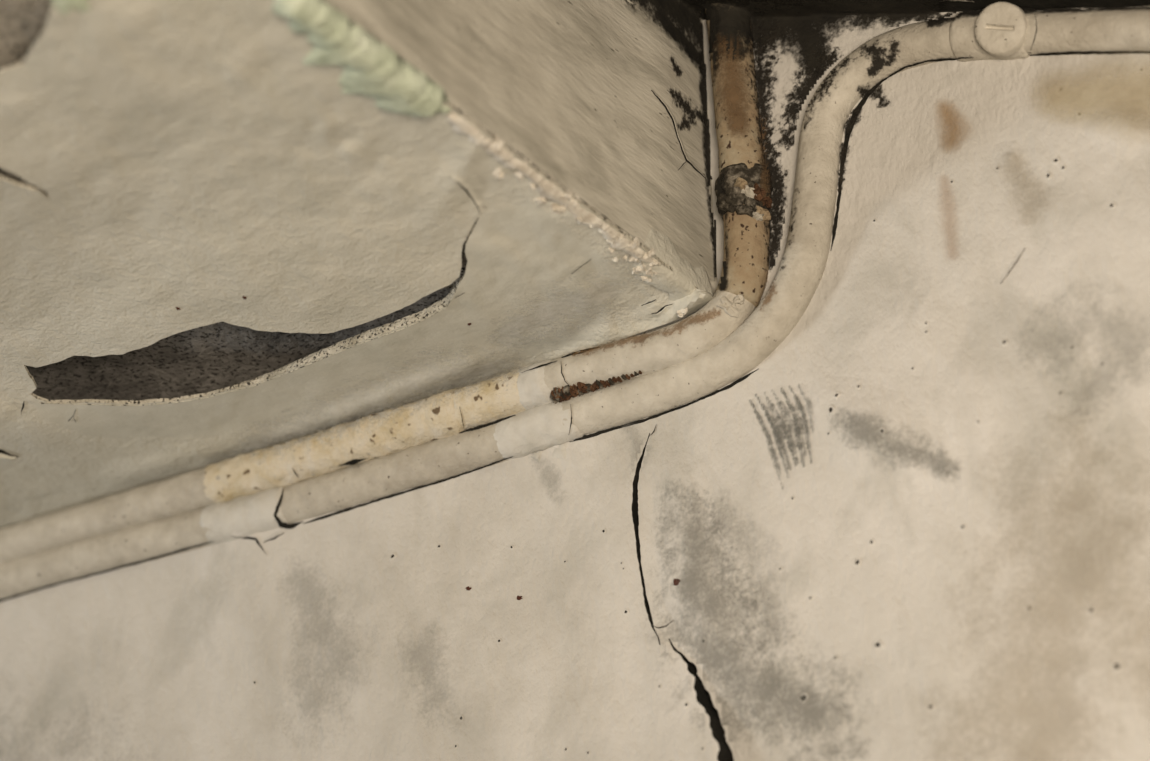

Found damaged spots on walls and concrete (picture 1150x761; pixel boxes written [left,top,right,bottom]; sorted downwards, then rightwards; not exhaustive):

peeling [0,0,713,528]
leakage [625,0,984,291]
leakage [1021,6,1150,14]
crack [632,426,734,761]